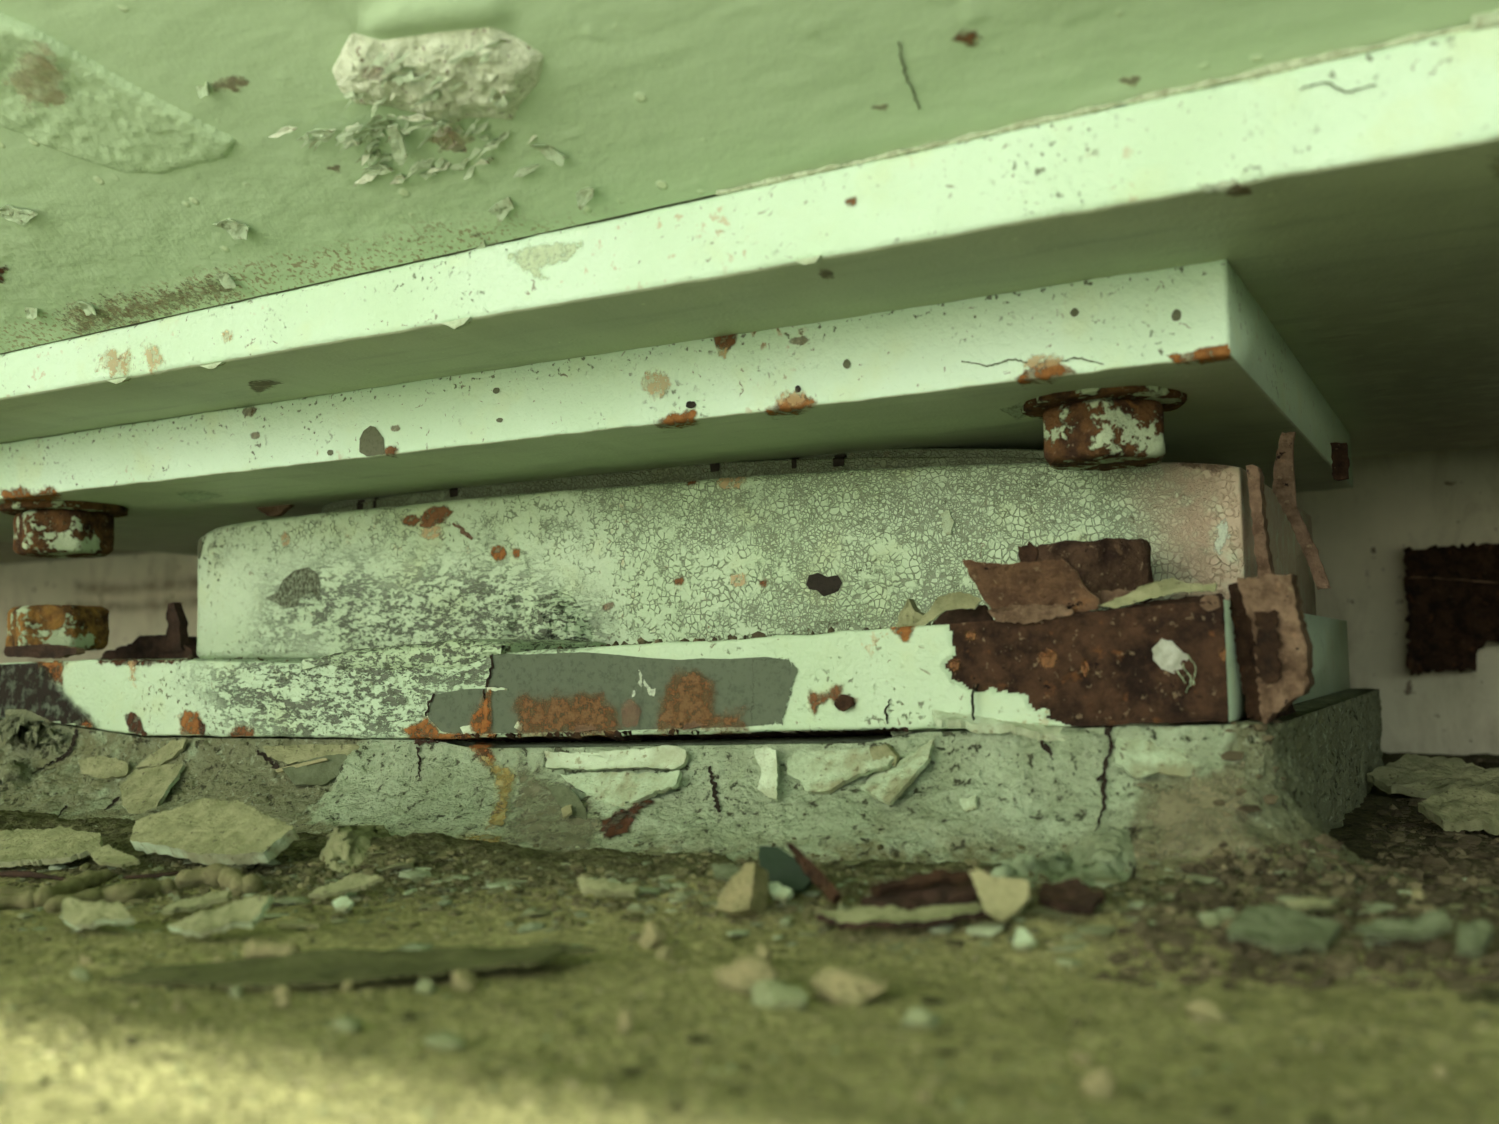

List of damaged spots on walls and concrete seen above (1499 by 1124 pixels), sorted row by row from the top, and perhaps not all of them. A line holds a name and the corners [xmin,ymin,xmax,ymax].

peeling [0,13,236,174]
peeling [196,77,248,98]
peeling [269,39,511,185]
peeling [513,135,565,178]
rust [403,505,452,540]
peeling [266,567,321,608]
rust [963,559,1100,612]
rust [1039,649,1058,668]
rust [1253,609,1283,683]
rust [514,671,747,738]
peeling [0,652,1285,953]
crack [1094,726,1137,877]